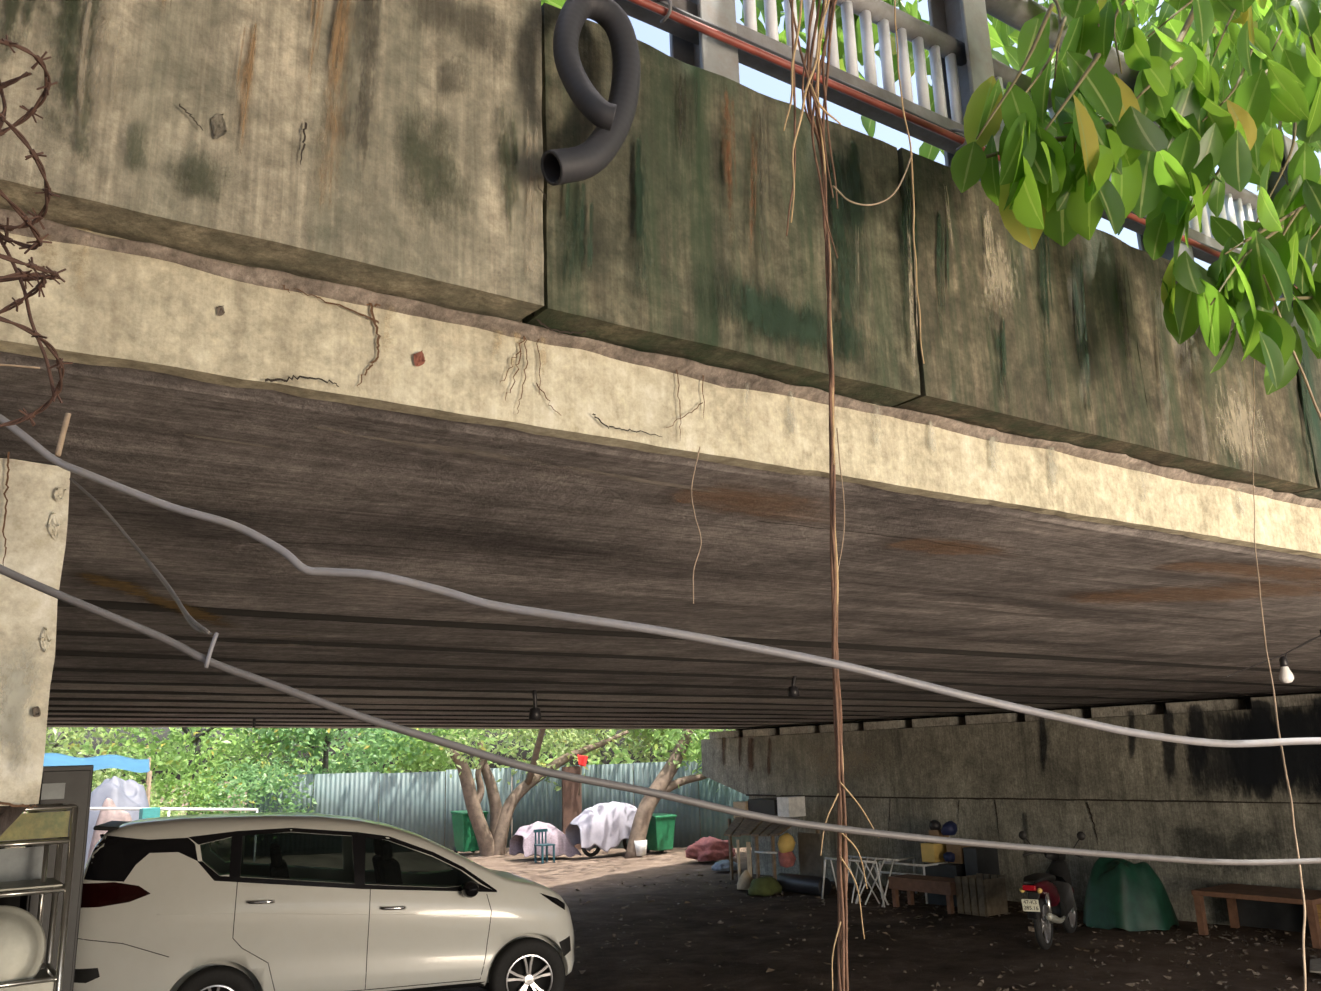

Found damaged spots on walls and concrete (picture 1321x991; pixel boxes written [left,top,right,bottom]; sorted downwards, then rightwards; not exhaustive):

leakage [4,0,34,52]
leakage [53,0,117,153]
corrosion [311,0,349,180]
leakage [500,113,538,271]
leakage [830,140,868,357]
leakage [900,179,918,360]
crack [265,285,381,387]
crack [502,313,586,414]
crack [592,370,705,437]
crack [2,452,10,566]
leakage [1039,717,1047,770]
leakage [1163,697,1321,799]